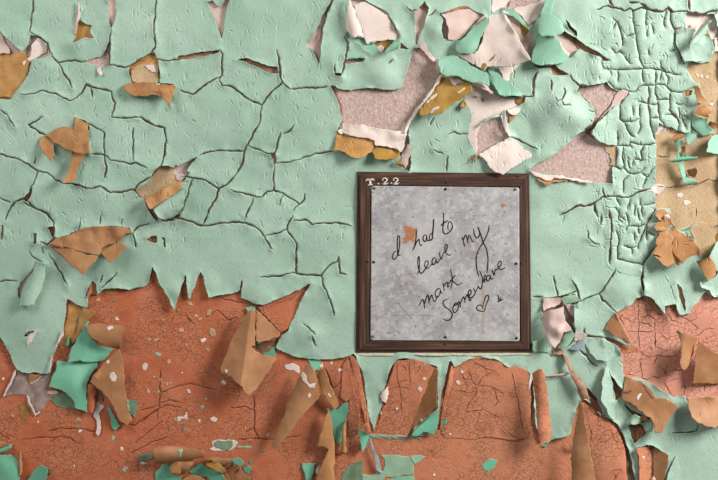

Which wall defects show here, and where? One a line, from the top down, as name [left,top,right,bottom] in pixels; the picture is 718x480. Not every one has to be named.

peeling [0,32,50,100]
peeling [2,281,132,441]
crack [0,0,167,285]
peeling [47,226,132,274]
crack [108,1,179,68]
crack [121,50,350,314]
peeling [220,284,310,396]
peeling [266,294,681,480]
peeling [330,0,629,185]
crack [500,72,587,105]
crack [553,0,718,394]
peeling [640,13,718,315]